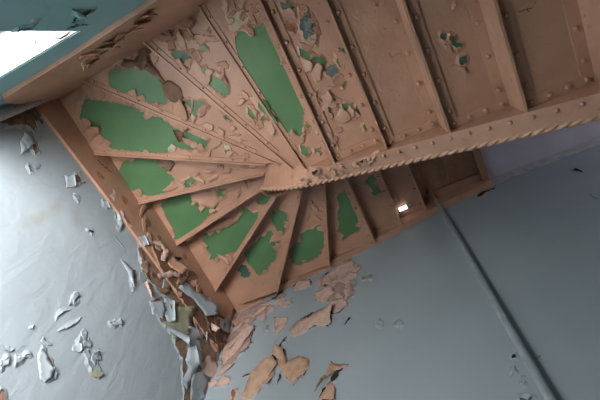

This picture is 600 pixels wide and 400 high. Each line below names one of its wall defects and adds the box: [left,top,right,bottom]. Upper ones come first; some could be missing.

peeling [155,25,231,99]
peeling [221,0,368,159]
peeling [437,29,470,76]
peeling [0,107,46,175]
peeling [65,171,85,204]
peeling [72,46,375,400]
peeling [68,291,80,307]
peeling [0,337,59,383]